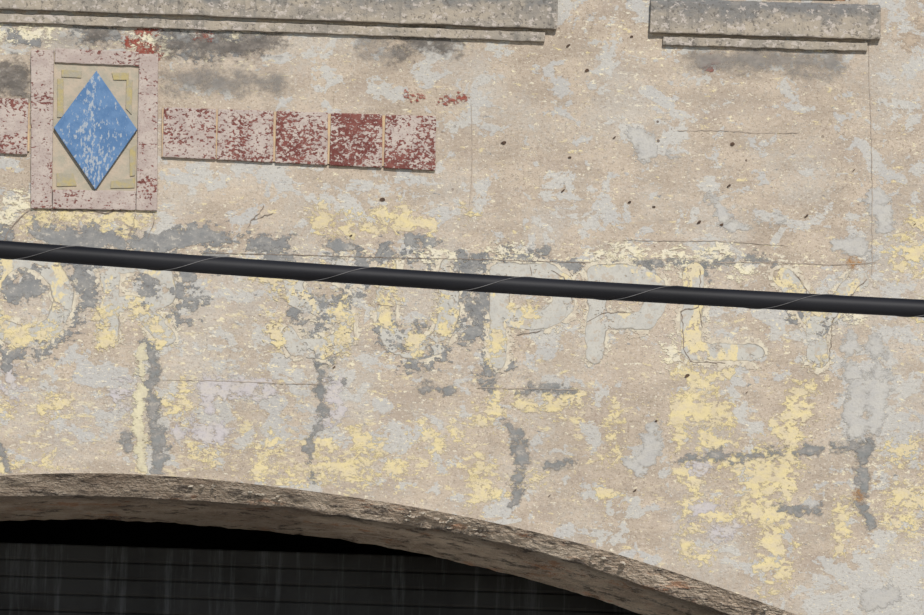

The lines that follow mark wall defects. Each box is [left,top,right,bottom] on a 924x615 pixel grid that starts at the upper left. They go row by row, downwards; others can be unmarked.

peeling [897,14,924,54]
peeling [0,184,297,262]
peeling [304,197,646,274]
peeling [659,190,787,283]
peeling [830,185,924,285]
peeling [786,274,816,293]
peeling [0,259,213,427]
peeling [0,447,67,474]
peeling [154,369,280,470]
peeling [240,277,587,534]
peeling [590,310,924,612]